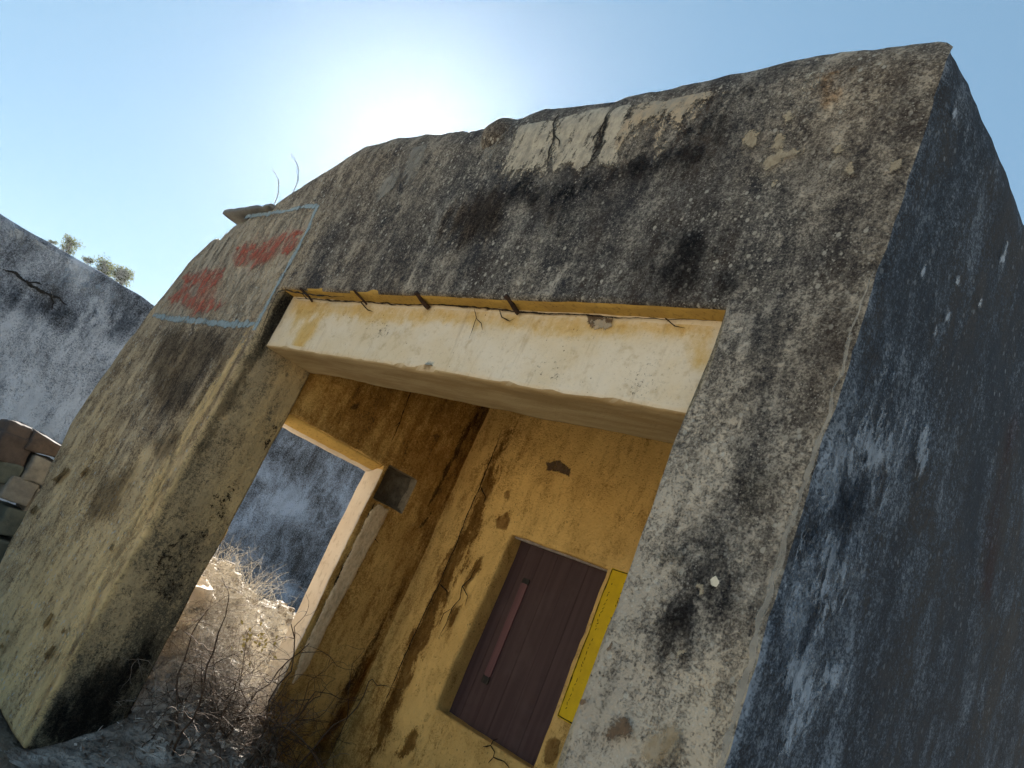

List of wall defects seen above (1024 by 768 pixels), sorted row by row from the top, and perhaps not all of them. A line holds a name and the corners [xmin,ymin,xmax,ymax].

crack [547,114,560,166]
crack [590,112,609,161]
peeling [501,91,724,181]
water stain [505,99,732,208]
flaking render [742,129,760,147]
flaking render [762,110,805,187]
crack [3,269,67,309]
water stain [632,222,748,295]
flaking render [546,460,570,476]
water stain [366,414,515,765]
mould [645,542,732,669]
water stain [36,634,156,743]